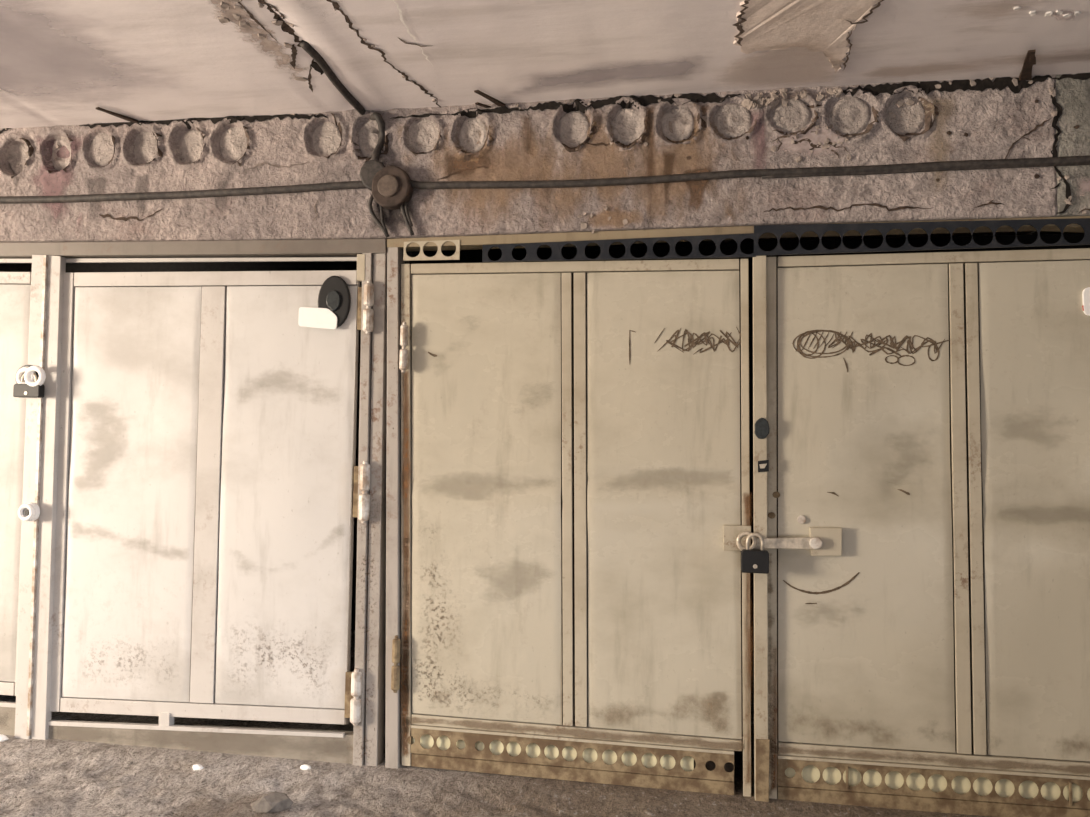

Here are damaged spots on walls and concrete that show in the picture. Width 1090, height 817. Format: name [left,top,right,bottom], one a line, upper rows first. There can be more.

damp [0,8,109,89]
crack [79,0,328,129]
crack [327,0,741,119]
peeling [741,87,843,110]
peeling [733,0,884,74]
crack [246,162,308,170]
crack [437,160,488,180]
crack [581,139,648,147]
peeling [771,124,852,163]
crack [764,73,1090,214]